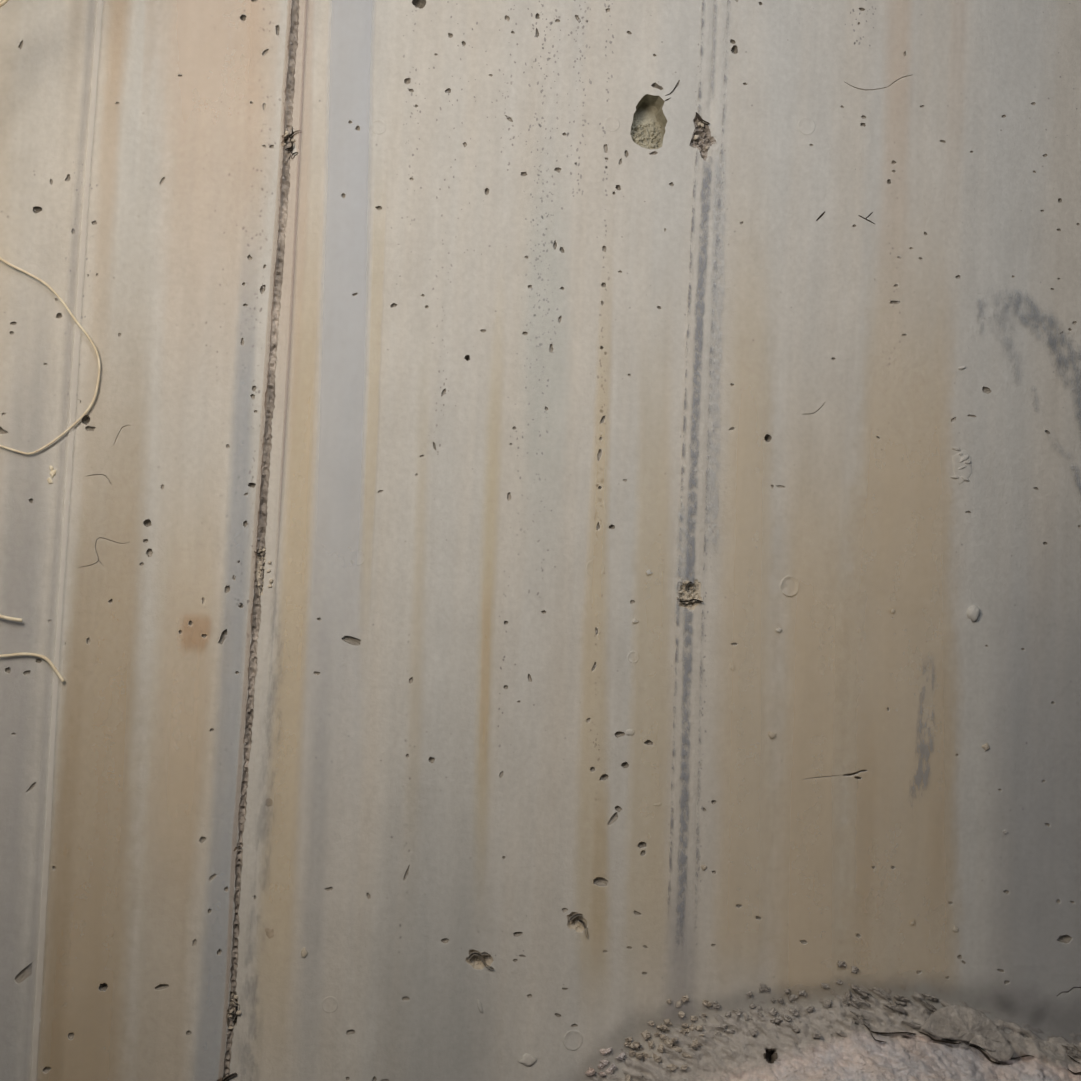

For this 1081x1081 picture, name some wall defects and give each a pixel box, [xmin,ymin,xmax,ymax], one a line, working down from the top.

spalling [603,80,680,165]
spalling [689,112,716,161]
water stain [668,153,720,923]
spalling [677,580,703,610]